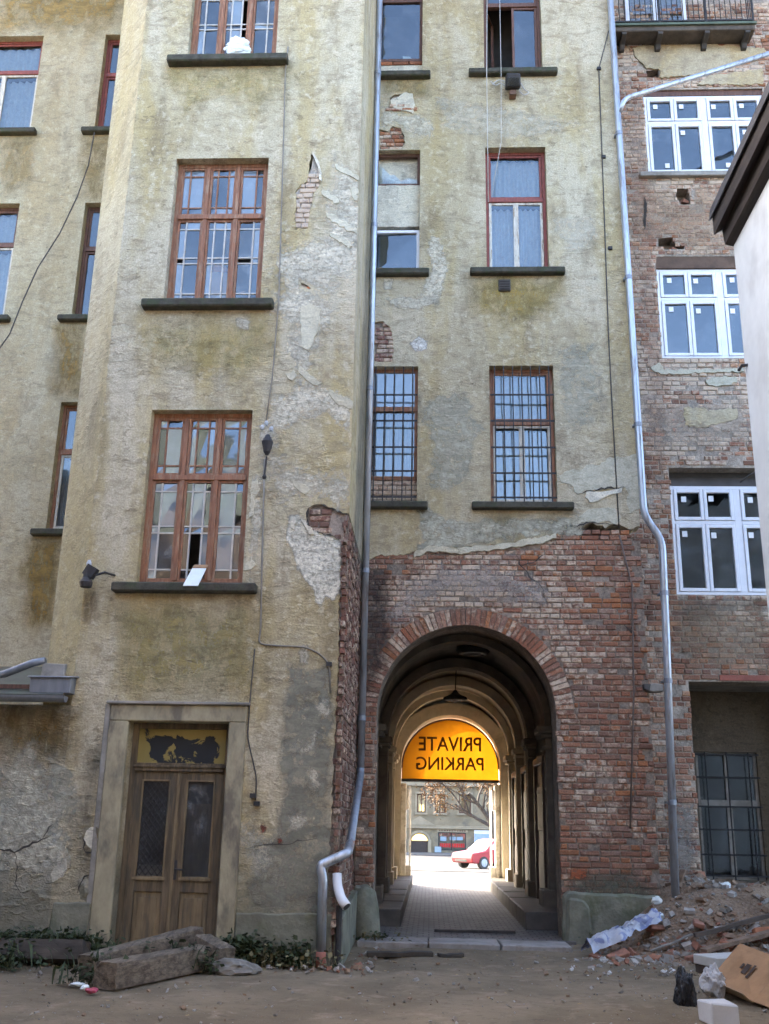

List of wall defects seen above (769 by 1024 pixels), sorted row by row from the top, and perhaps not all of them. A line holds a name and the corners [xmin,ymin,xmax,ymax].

spalling [379,92,433,153]
peeling [650,362,744,375]
spalling [244,153,661,965]
crack [0,824,53,893]
peeling [543,921,729,987]